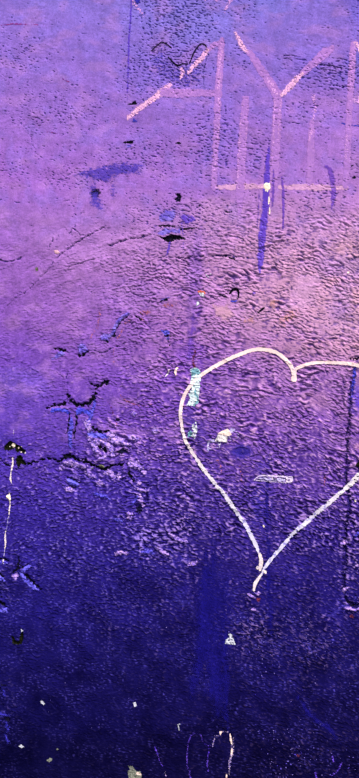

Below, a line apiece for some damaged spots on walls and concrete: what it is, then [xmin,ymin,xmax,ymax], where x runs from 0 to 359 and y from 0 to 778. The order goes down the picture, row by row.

crack [0,368,135,482]